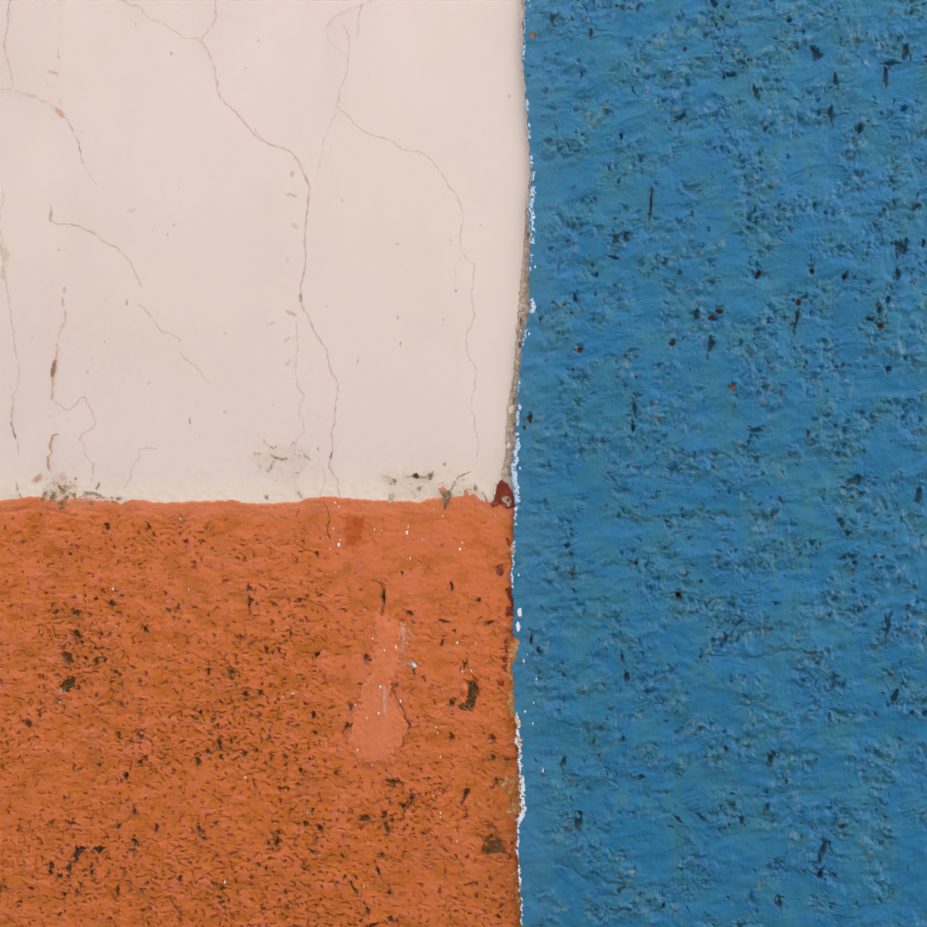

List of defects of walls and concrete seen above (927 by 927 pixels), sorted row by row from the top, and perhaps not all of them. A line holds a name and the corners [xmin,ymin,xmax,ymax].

flaking render [521,0,535,60]
flaking render [464,123,536,525]
flaking render [439,472,469,509]